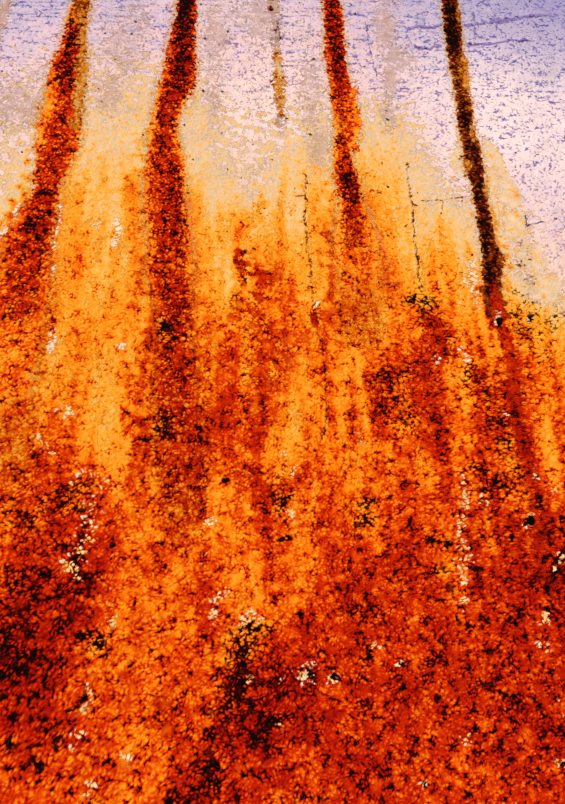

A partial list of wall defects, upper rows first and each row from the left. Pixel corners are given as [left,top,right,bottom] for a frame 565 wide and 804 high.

rust [0,232,8,267]